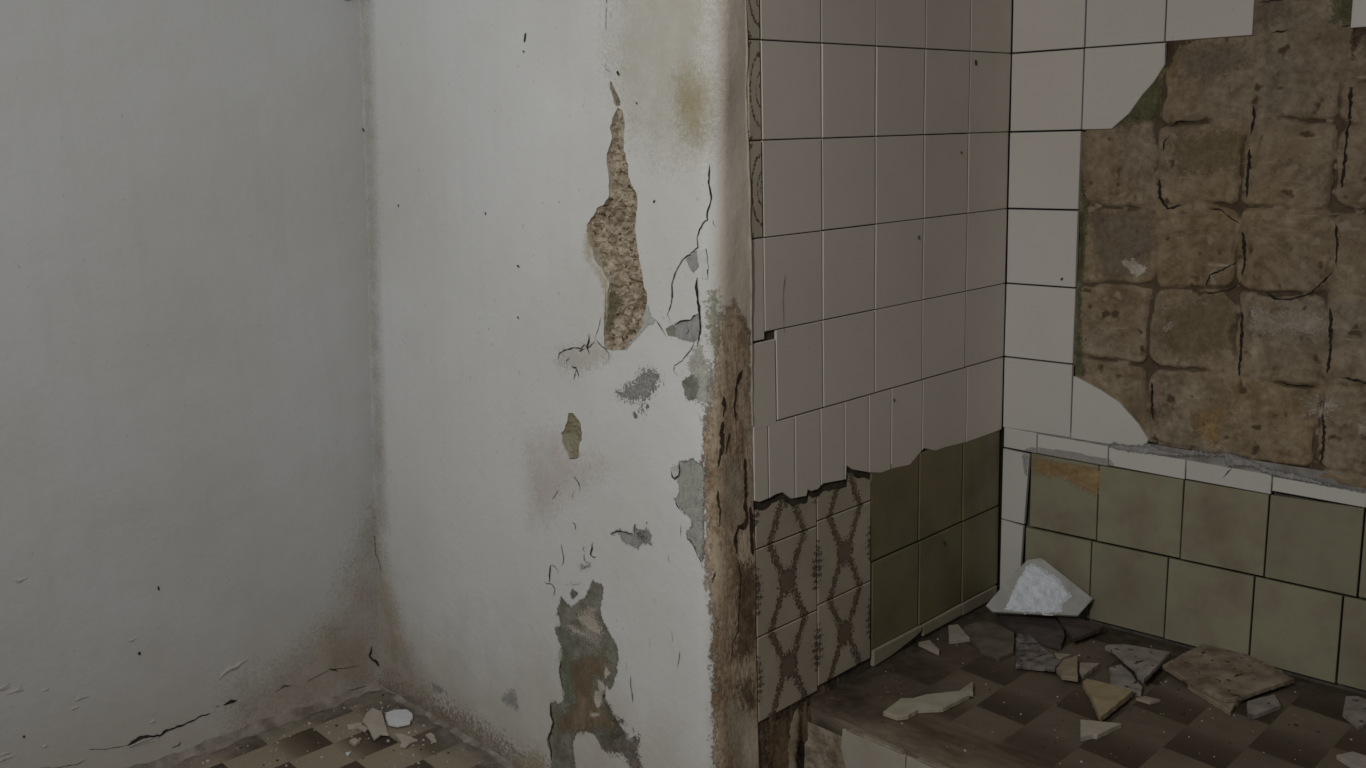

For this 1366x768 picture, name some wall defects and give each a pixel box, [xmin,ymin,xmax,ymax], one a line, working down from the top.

crack [657,166,716,375]
peeling [1074,0,1366,489]
flaking render [587,81,820,768]
crack [89,700,237,750]
flaking render [546,581,643,768]
spalling [883,682,973,721]